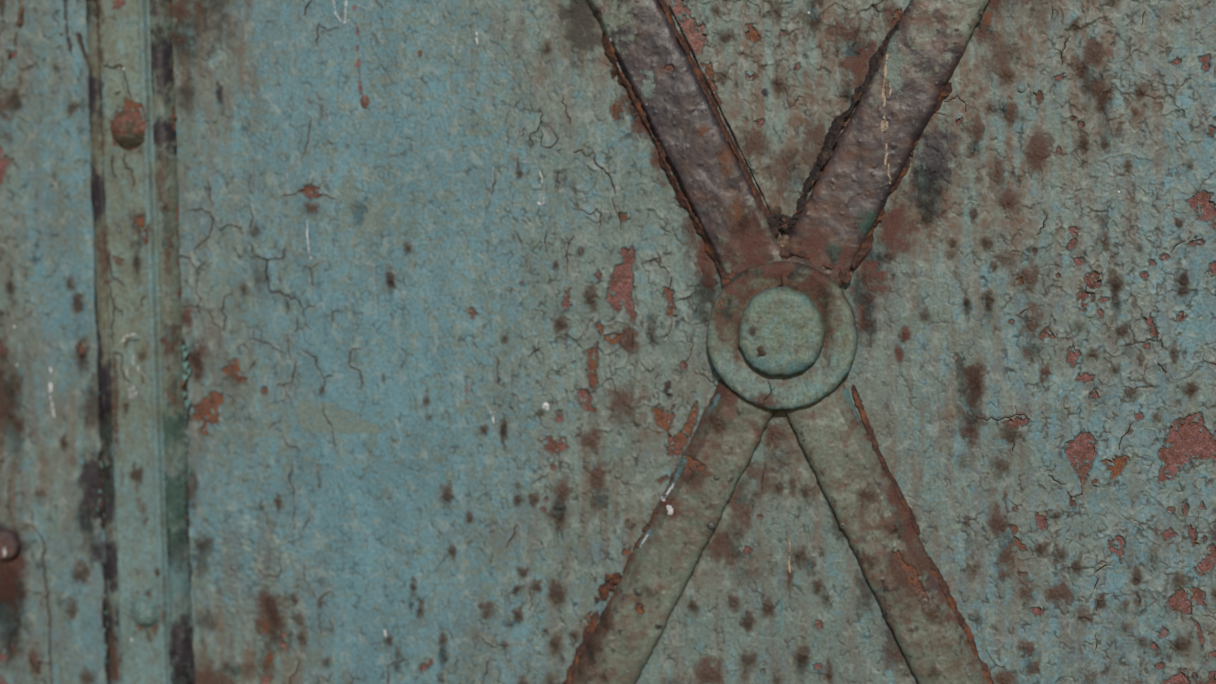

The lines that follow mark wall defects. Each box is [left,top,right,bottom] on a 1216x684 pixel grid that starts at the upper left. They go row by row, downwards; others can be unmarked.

crack [491,95,621,274]
rust [1025,133,1051,171]
rust [1071,19,1117,153]
rust [66,0,304,684]
peeling [180,340,225,436]
crack [180,177,363,532]
peeling [575,246,637,414]
peeling [652,382,720,488]
rust [955,357,985,444]
rust [1107,270,1124,296]
peeling [1158,413,1216,482]
peeling [1156,503,1216,684]